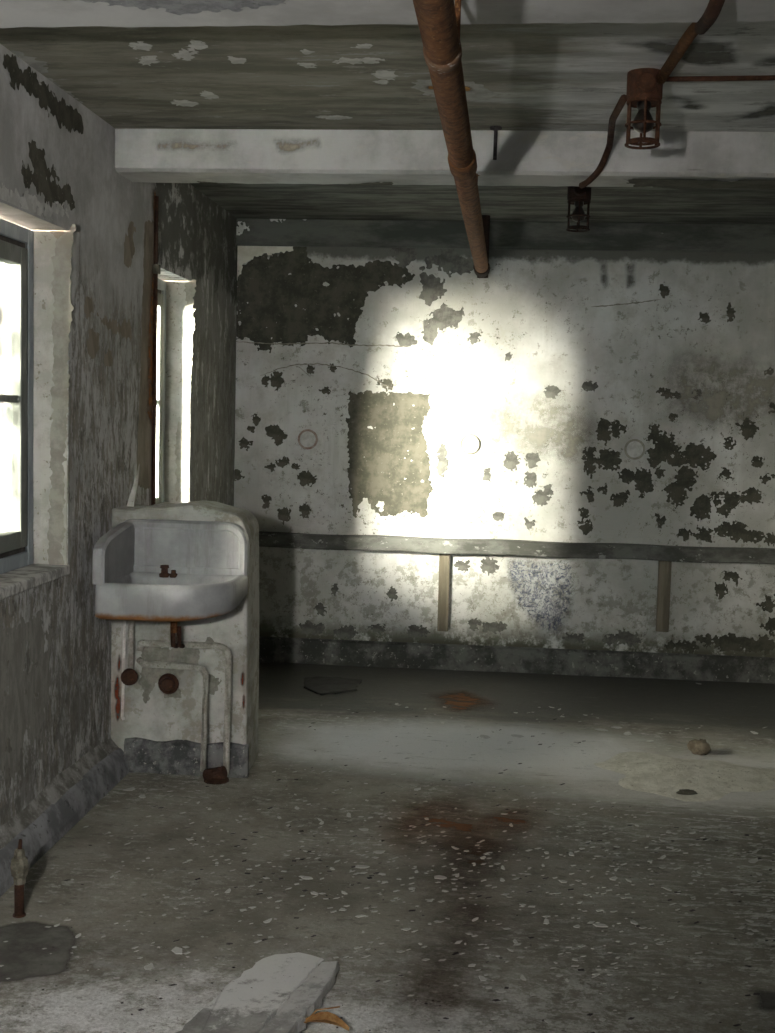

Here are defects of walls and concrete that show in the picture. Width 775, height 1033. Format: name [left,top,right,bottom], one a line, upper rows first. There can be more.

peeling [3,54,84,134]
peeling [21,140,77,211]
peeling [236,221,474,353]
peeling [47,220,154,565]
peeling [174,279,197,501]
peeling [239,414,317,487]
peeling [346,379,449,518]
peeling [482,451,554,506]
peeling [544,385,561,399]
peeling [577,413,775,547]
peeling [664,594,775,655]
rust [390,803,530,927]